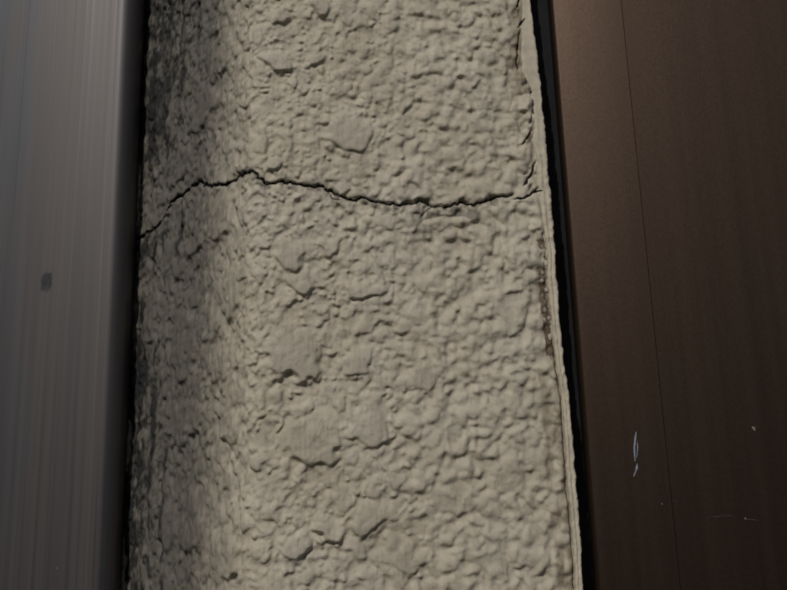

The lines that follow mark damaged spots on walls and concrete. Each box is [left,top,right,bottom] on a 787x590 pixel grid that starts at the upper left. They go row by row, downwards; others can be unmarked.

crack [516,0,534,144]
crack [137,161,543,241]